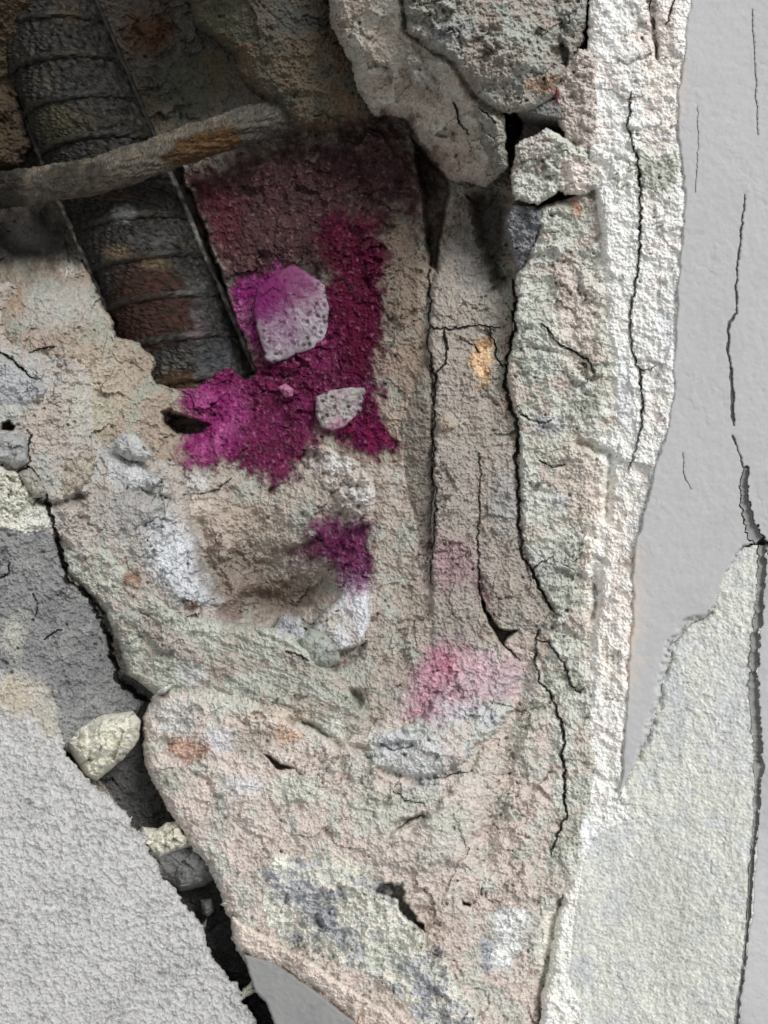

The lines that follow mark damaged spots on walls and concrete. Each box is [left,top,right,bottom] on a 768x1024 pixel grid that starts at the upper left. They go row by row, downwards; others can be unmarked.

spalling [0,0,263,171]
rust [161,126,248,165]
crack [453,102,495,135]
rust [107,267,201,352]
spalling [0,118,446,622]
crack [542,324,595,373]
crack [626,95,655,470]
crack [17,430,175,836]
crack [427,270,584,851]
peeling [540,0,768,1024]
crack [177,879,274,1024]